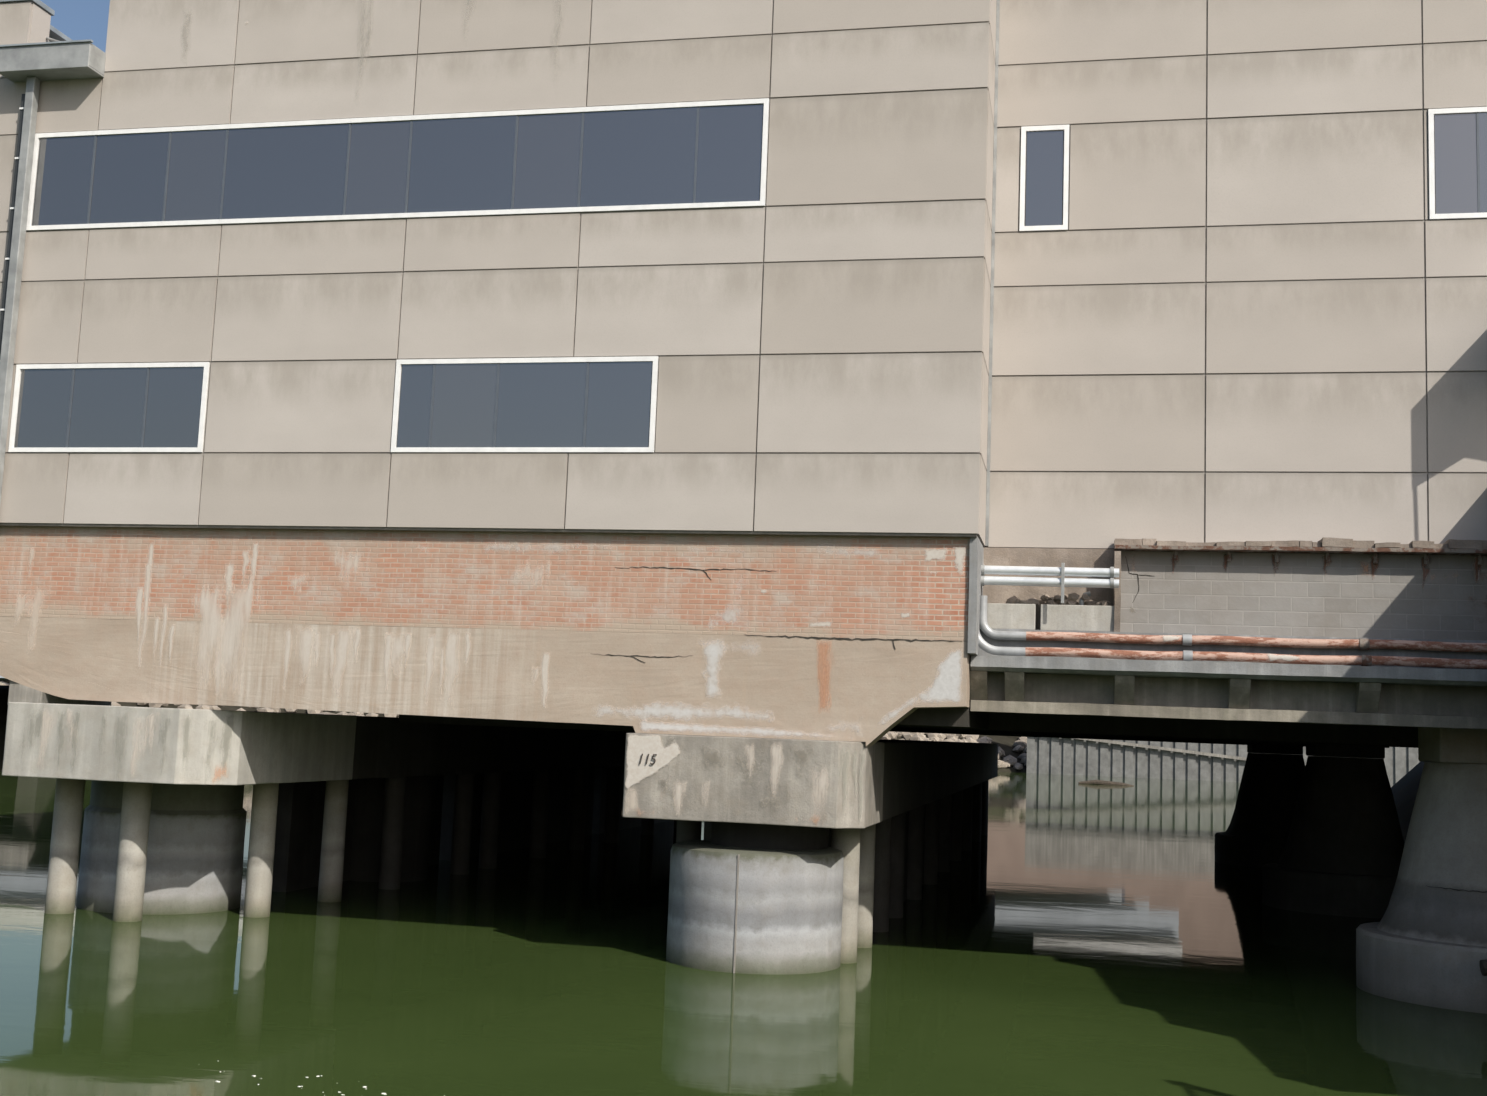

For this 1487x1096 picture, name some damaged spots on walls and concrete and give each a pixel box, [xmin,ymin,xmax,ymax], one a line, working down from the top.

damp [136,544,174,666]
damp [196,544,258,688]
crack [616,566,770,580]
damp [284,629,360,693]
damp [385,634,470,697]
damp [535,654,549,706]
crack [590,653,693,663]
rust [818,643,830,708]